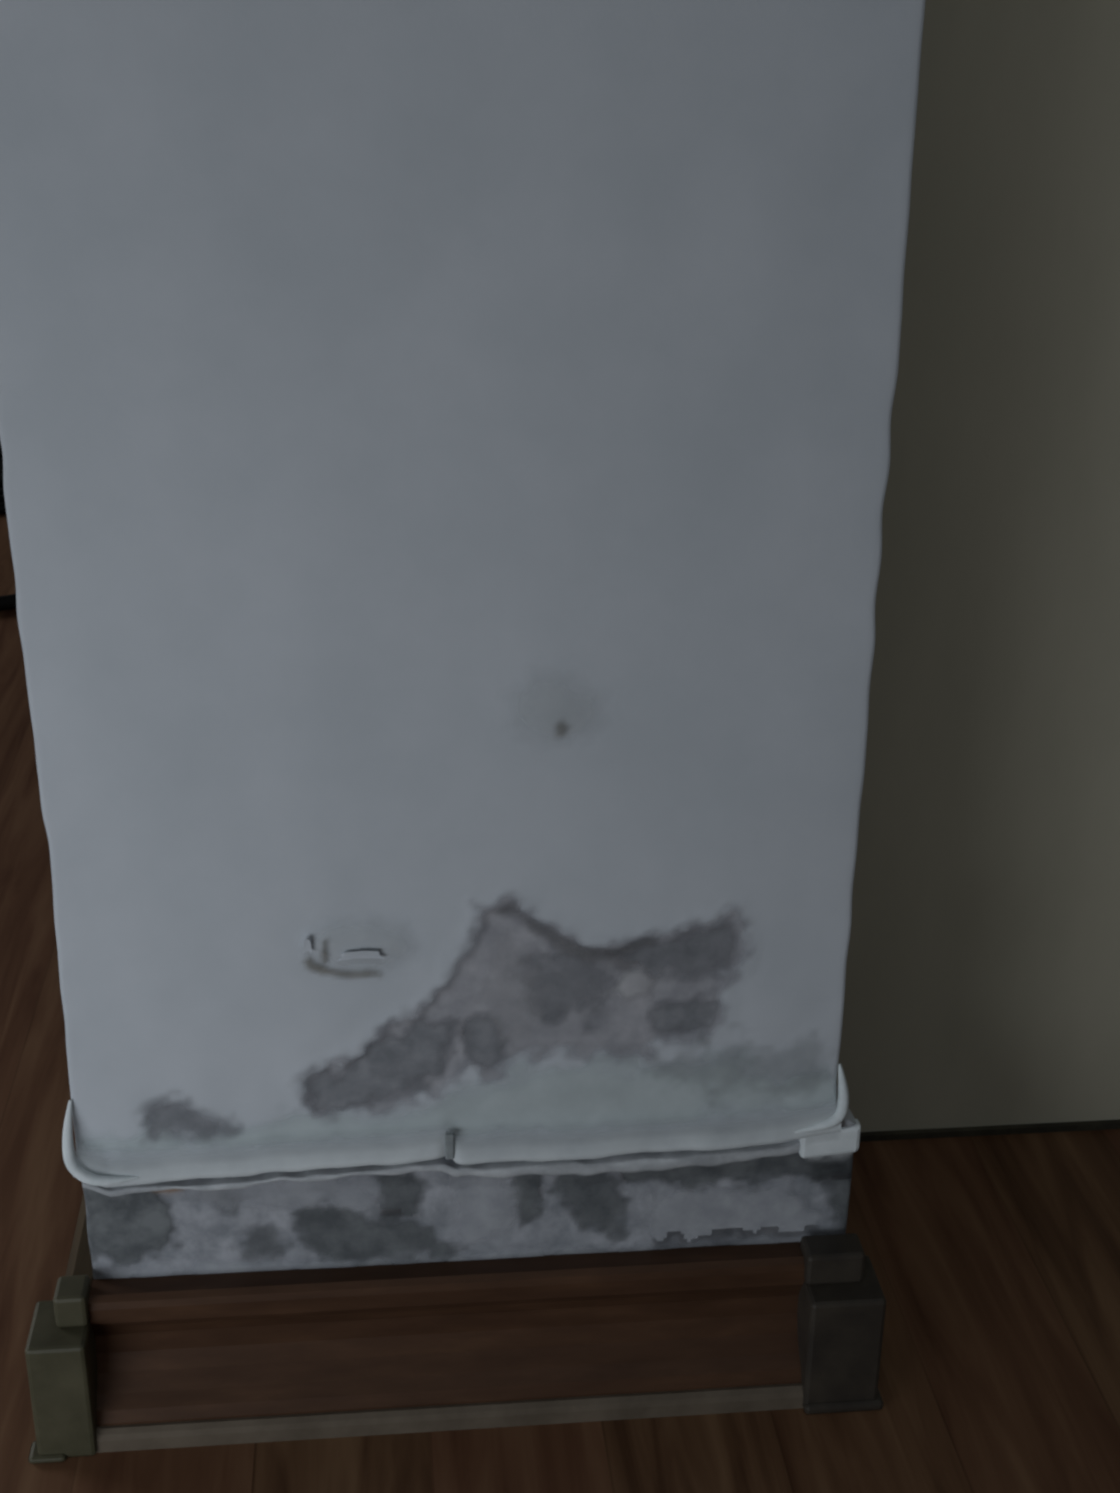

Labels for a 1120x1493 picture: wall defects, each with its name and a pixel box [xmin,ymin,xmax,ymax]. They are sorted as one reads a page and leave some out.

leakage [88,1056,835,1150]
spalling [62,1063,861,1279]